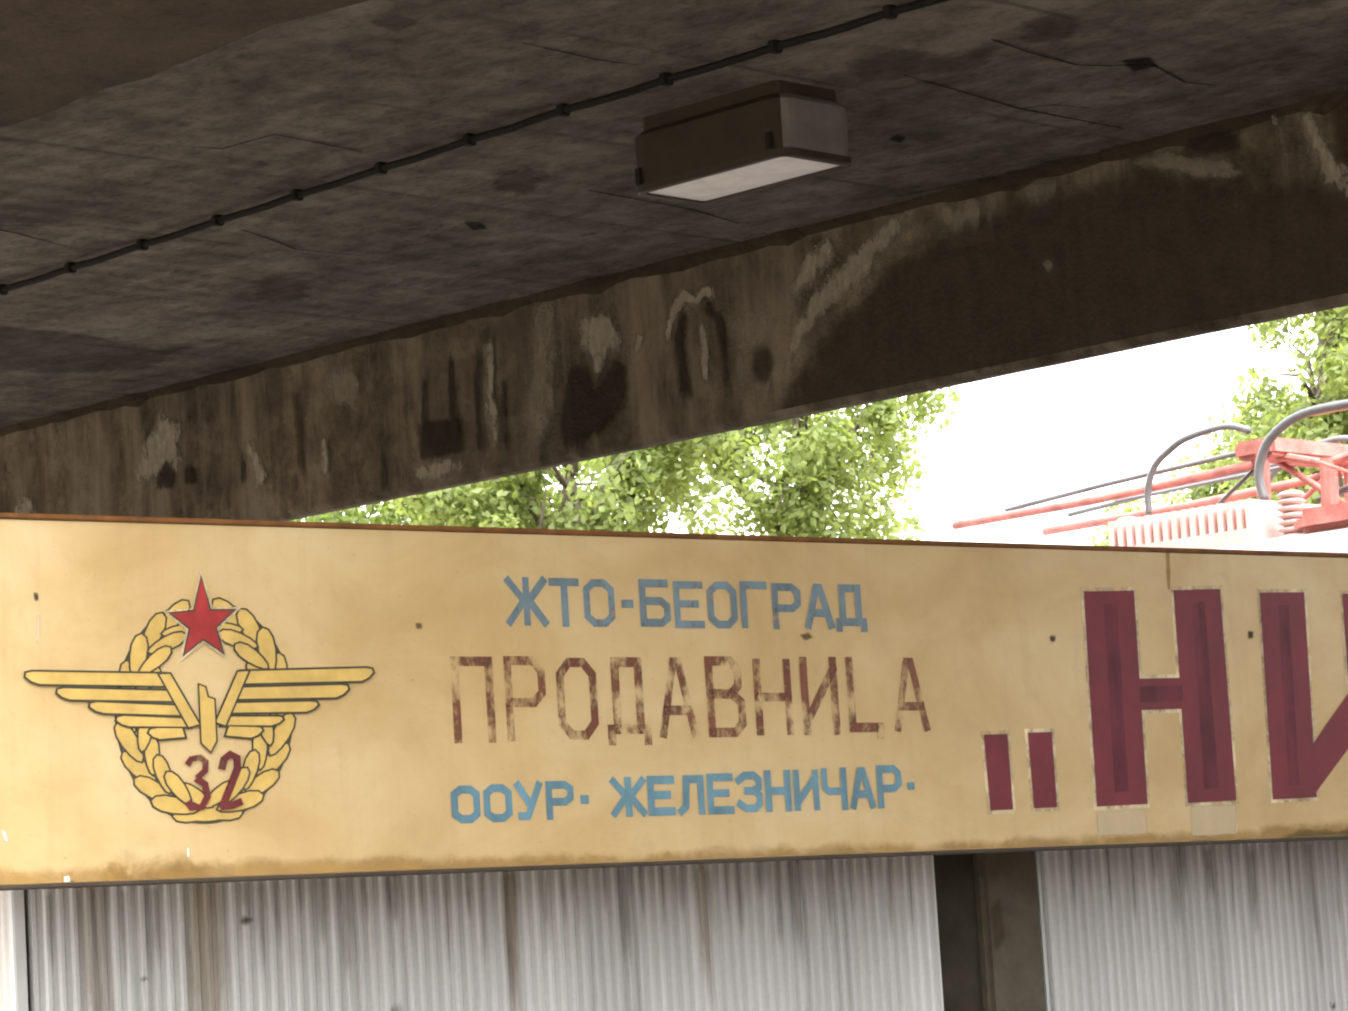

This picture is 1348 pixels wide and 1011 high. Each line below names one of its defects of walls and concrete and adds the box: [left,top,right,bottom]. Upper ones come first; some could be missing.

spalling [1138,132,1242,178]
damp [415,343,507,480]
damp [529,302,643,448]
damp [81,887,110,1011]
damp [188,883,222,1011]
damp [698,865,710,961]